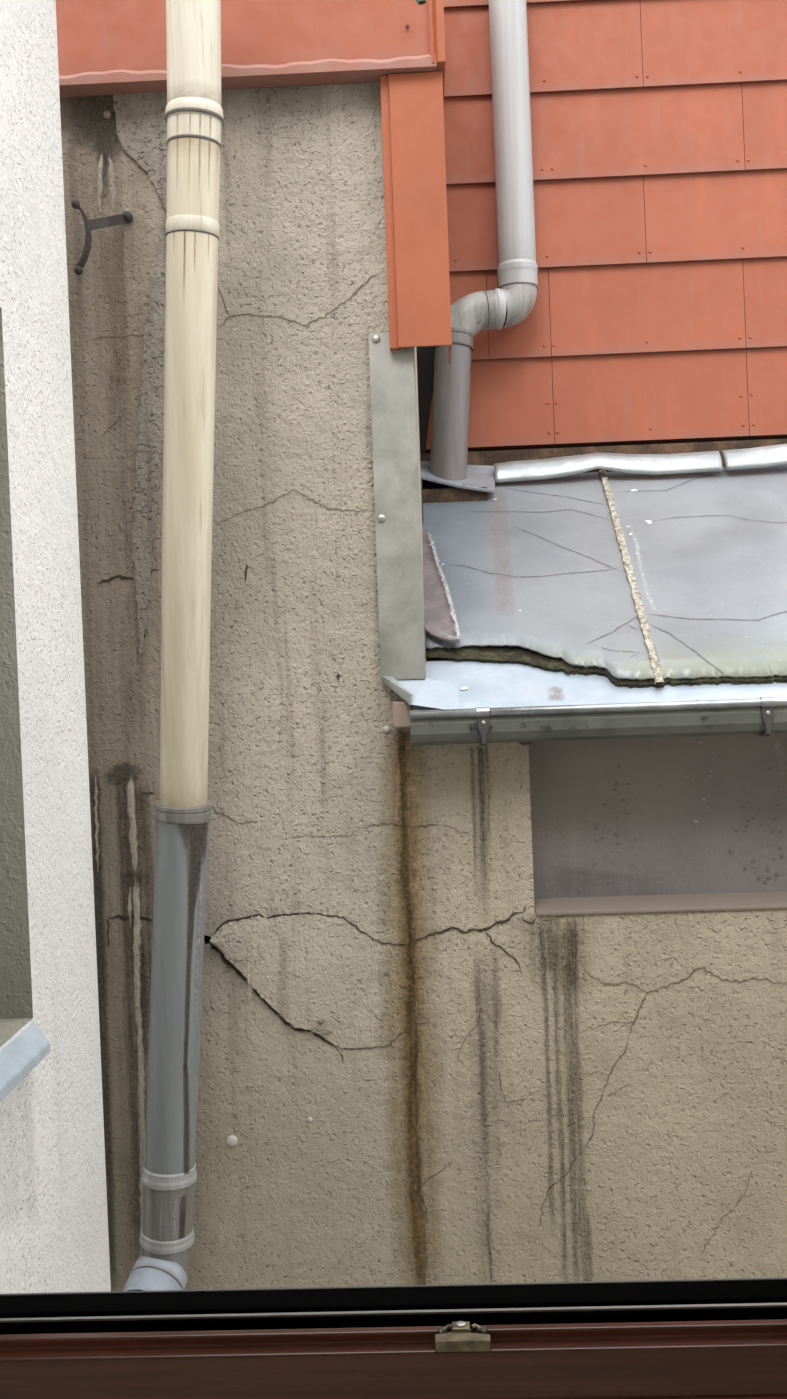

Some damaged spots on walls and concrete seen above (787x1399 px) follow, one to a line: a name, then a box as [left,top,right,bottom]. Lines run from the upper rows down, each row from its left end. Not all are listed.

leakage [97,123,116,212]
crack [218,271,383,326]
crack [218,489,370,523]
leakage [91,764,151,1277]
crack [214,906,565,1065]
leakage [540,919,590,1266]
crack [539,967,787,1225]
leakage [159,1196,185,1241]
crack [702,1171,752,1253]